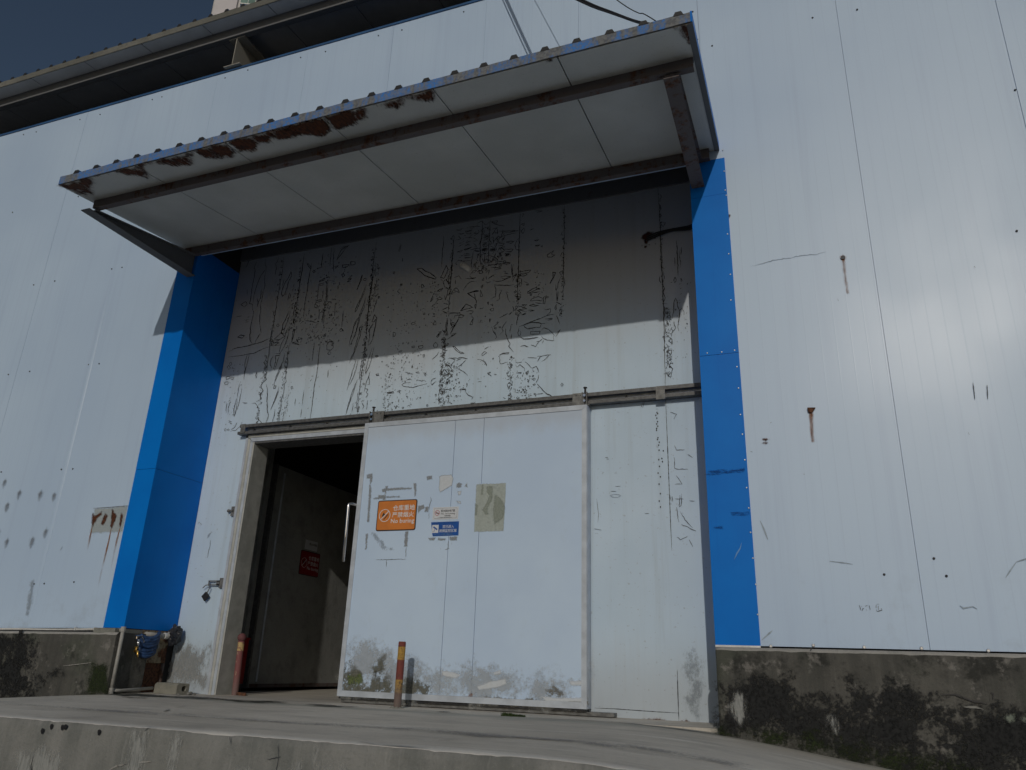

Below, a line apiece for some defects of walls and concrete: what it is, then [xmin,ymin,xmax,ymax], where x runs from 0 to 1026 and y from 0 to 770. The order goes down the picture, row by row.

rust [385,90,435,109]
rust [114,108,368,179]
rust [60,175,100,195]
peeling [224,207,567,431]
peeling [658,194,691,378]
rust [89,506,127,555]
leakage [0,630,64,698]
leakage [714,670,1026,770]